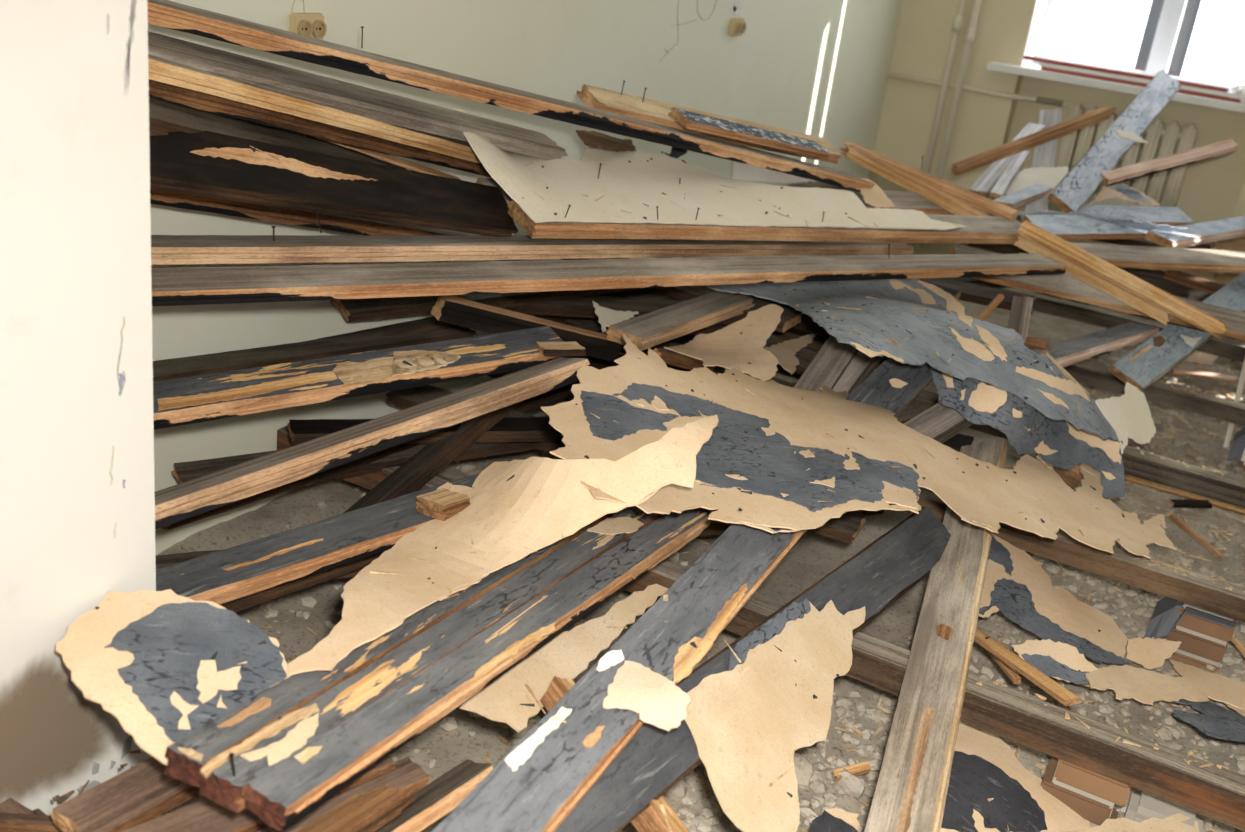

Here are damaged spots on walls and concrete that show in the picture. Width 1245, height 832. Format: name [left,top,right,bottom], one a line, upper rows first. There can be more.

flaking render [1215,236,1245,251]
flaking render [1213,272,1242,284]